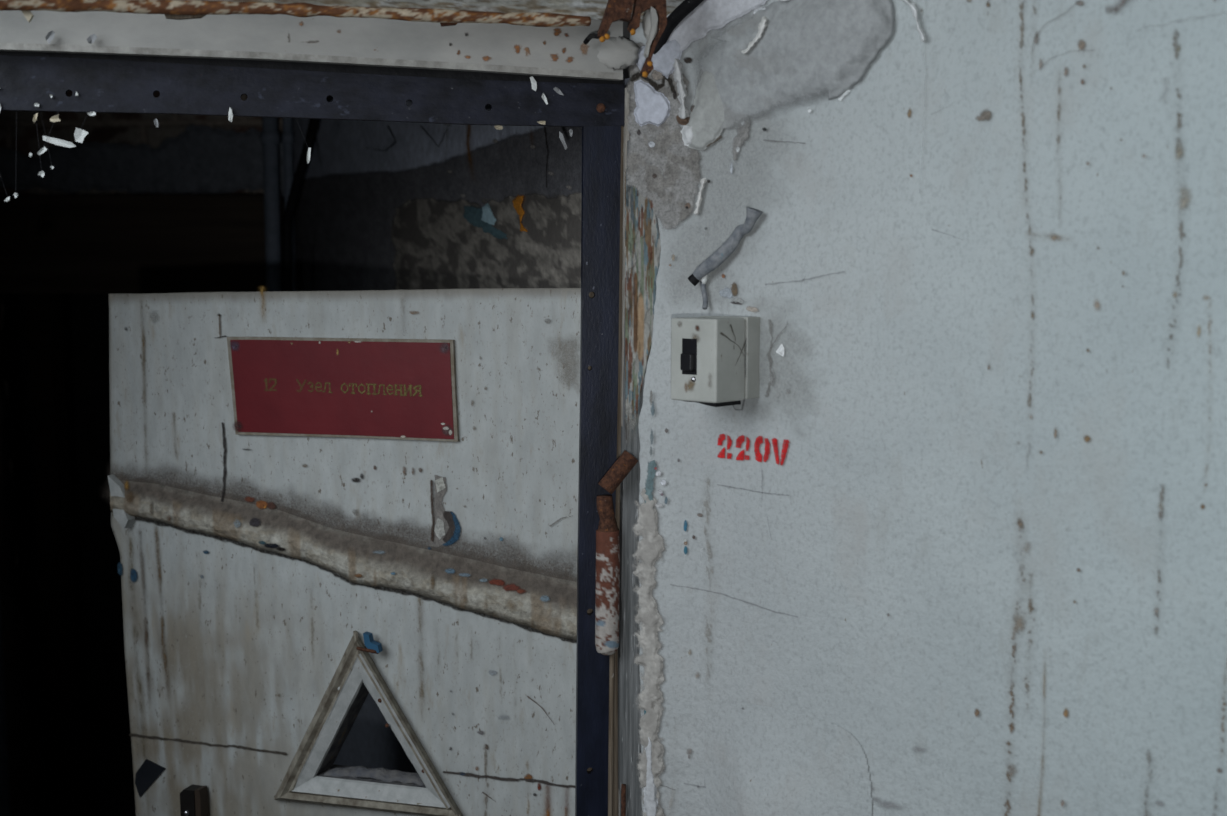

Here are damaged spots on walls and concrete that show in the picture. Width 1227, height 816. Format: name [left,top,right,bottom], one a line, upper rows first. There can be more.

rust [0,0,610,62]
flaking render [294,121,582,291]
spalling [623,39,805,425]
spalling [633,428,668,816]